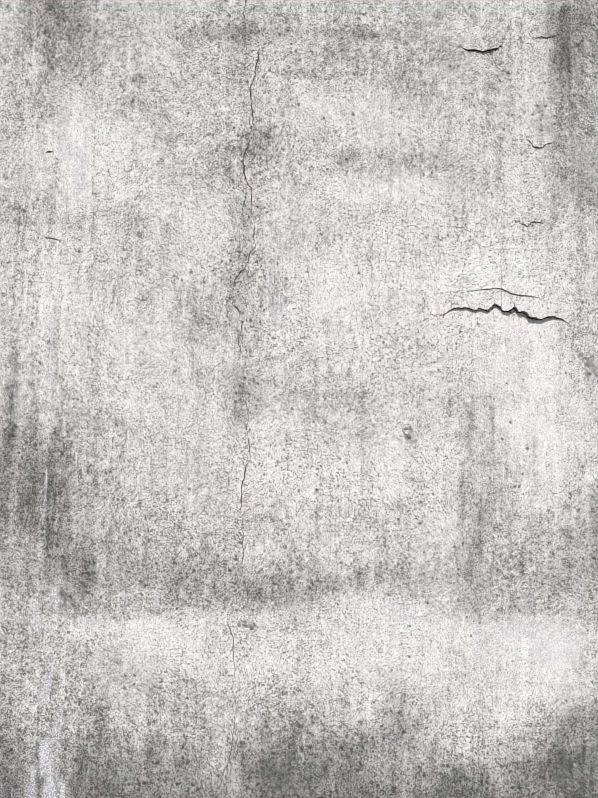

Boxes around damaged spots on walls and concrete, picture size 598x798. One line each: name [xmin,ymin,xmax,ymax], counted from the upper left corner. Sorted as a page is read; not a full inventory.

leakage [19,0,114,84]
flaking render [460,18,503,52]
leakage [544,0,598,99]
flaking render [420,246,571,326]
crack [218,1,266,798]
leakage [0,696,598,798]